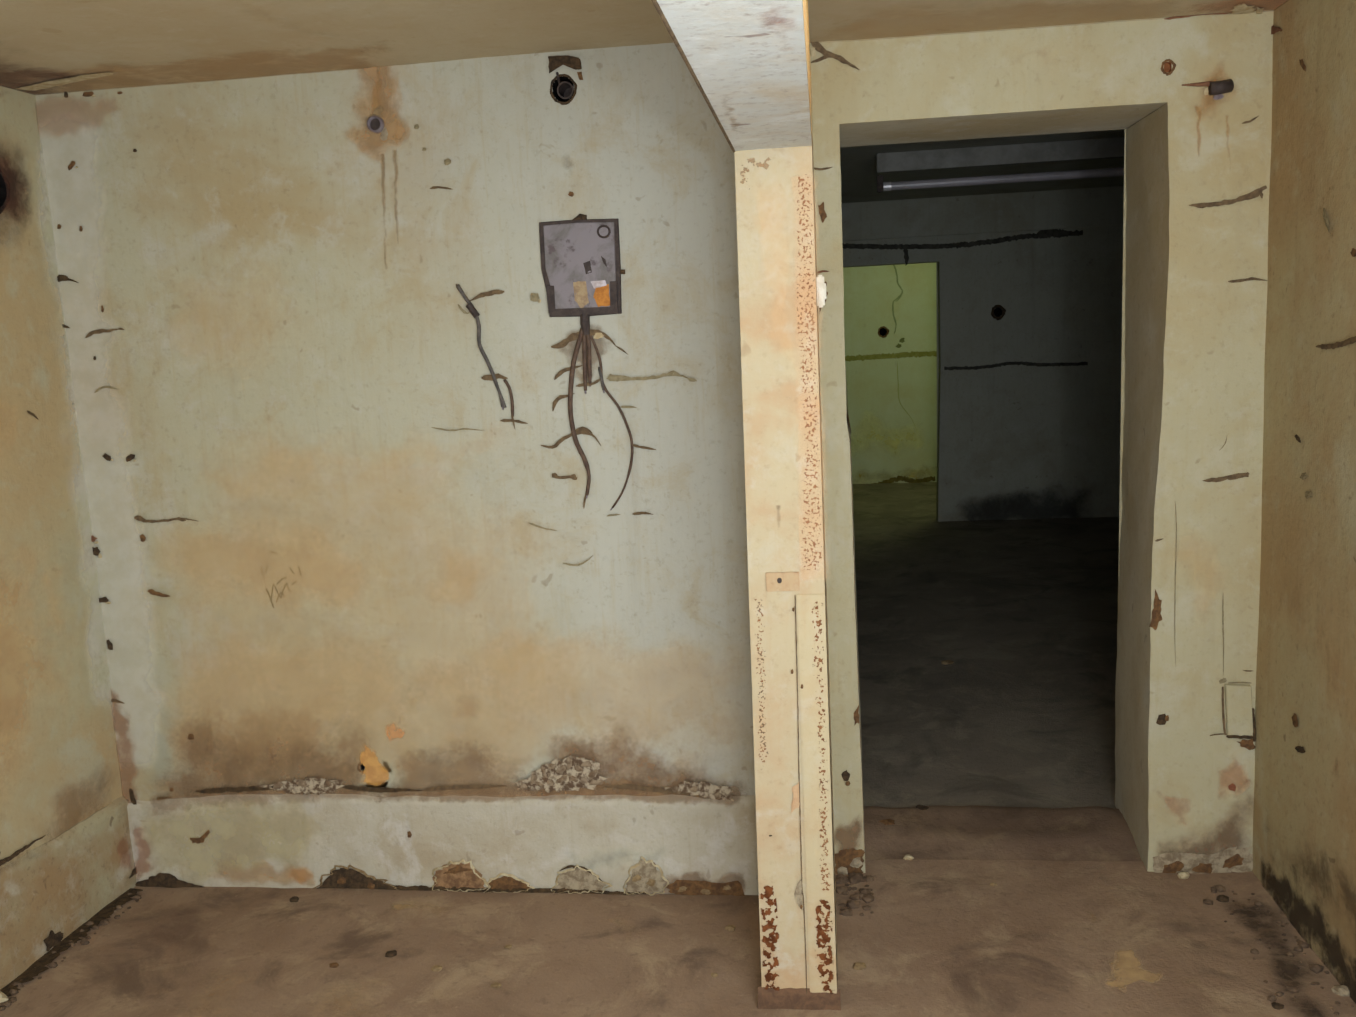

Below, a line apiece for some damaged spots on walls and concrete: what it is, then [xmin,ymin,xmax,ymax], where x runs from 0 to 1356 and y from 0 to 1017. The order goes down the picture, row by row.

rust [357,66,406,150]
crack [456,284,504,314]
rust [797,177,822,570]
crack [432,329,697,516]
water stain [167,721,358,799]
spalling [515,756,607,793]
water stain [532,742,711,799]
crack [0,835,45,866]
spalling [432,859,535,893]
spalling [551,856,745,896]
rust [760,886,780,991]
water stain [1233,860,1356,1017]